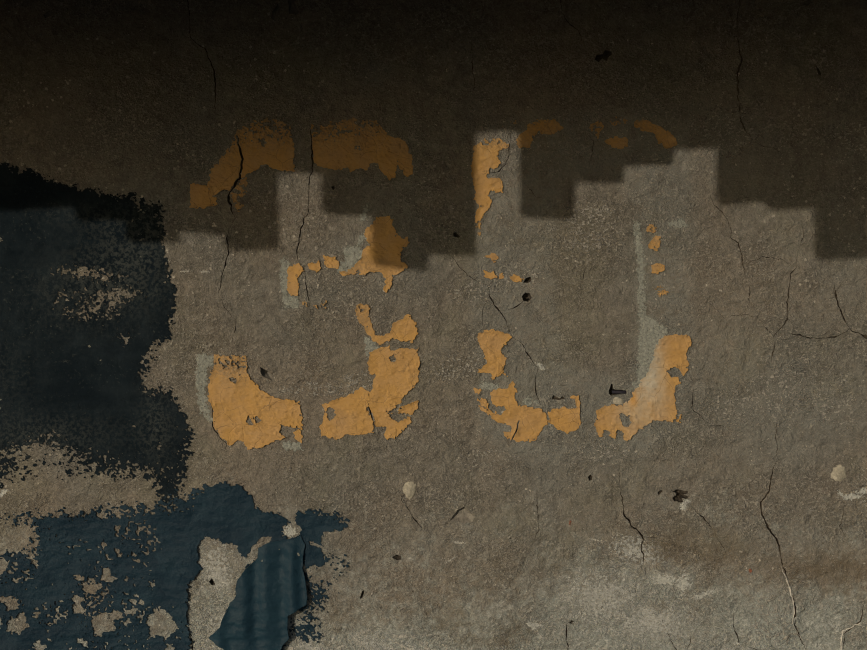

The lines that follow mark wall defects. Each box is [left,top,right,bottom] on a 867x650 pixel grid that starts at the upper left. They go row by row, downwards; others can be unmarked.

peeling [0,162,350,650]
crack [218,138,244,340]
crack [296,126,314,315]
peeling [287,216,410,309]
peeling [319,304,420,440]
crack [452,257,552,403]
peeling [471,119,564,236]
peeling [473,329,581,442]
peeling [594,334,692,441]
crack [710,196,867,364]
crack [619,468,664,593]
crack [733,424,807,650]